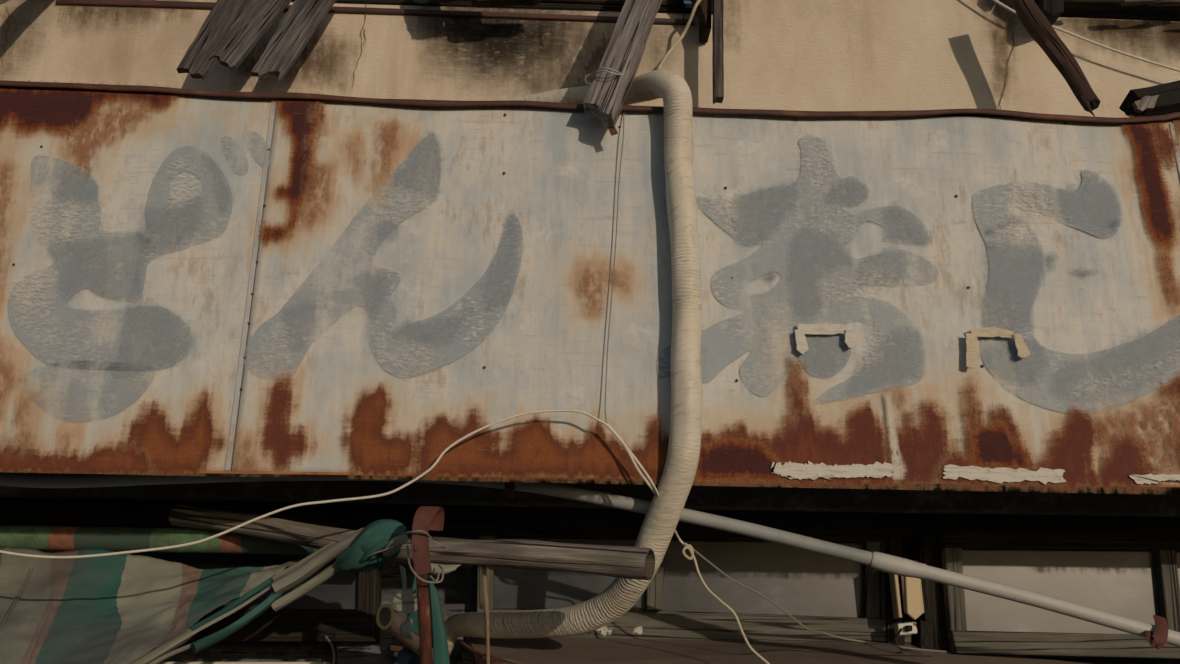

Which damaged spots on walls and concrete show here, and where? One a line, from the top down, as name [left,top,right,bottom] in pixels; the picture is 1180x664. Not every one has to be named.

water stain [427,7,611,89]
crack [999,17,1015,109]
rust [0,86,177,174]
rust [259,99,331,244]
rust [1123,120,1180,308]
rust [0,391,225,476]
rust [236,376,308,474]
rust [342,385,669,485]
rust [693,361,1180,493]